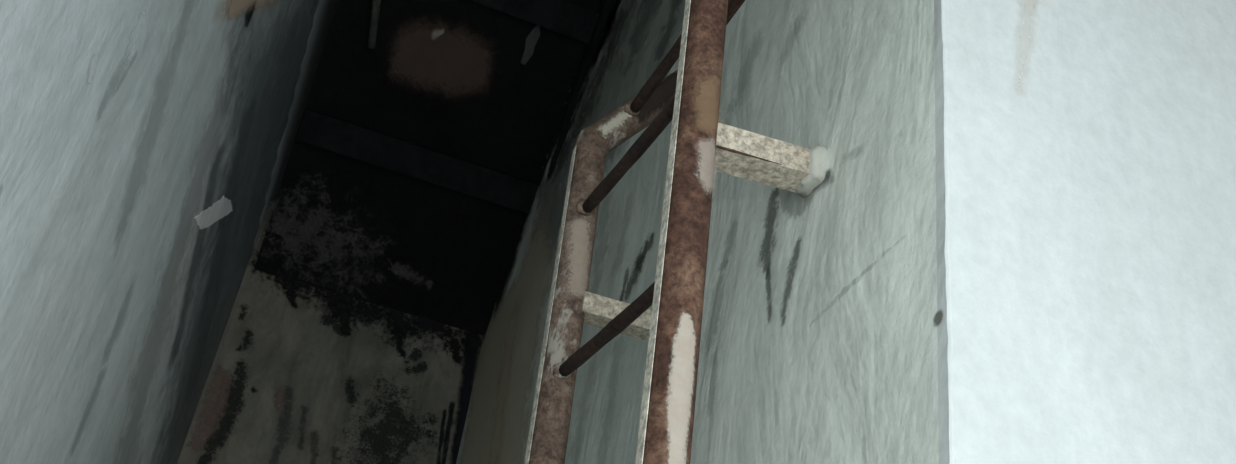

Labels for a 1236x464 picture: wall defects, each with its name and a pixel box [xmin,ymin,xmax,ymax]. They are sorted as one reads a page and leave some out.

water stain [338,348,455,464]
water stain [461,213,553,464]